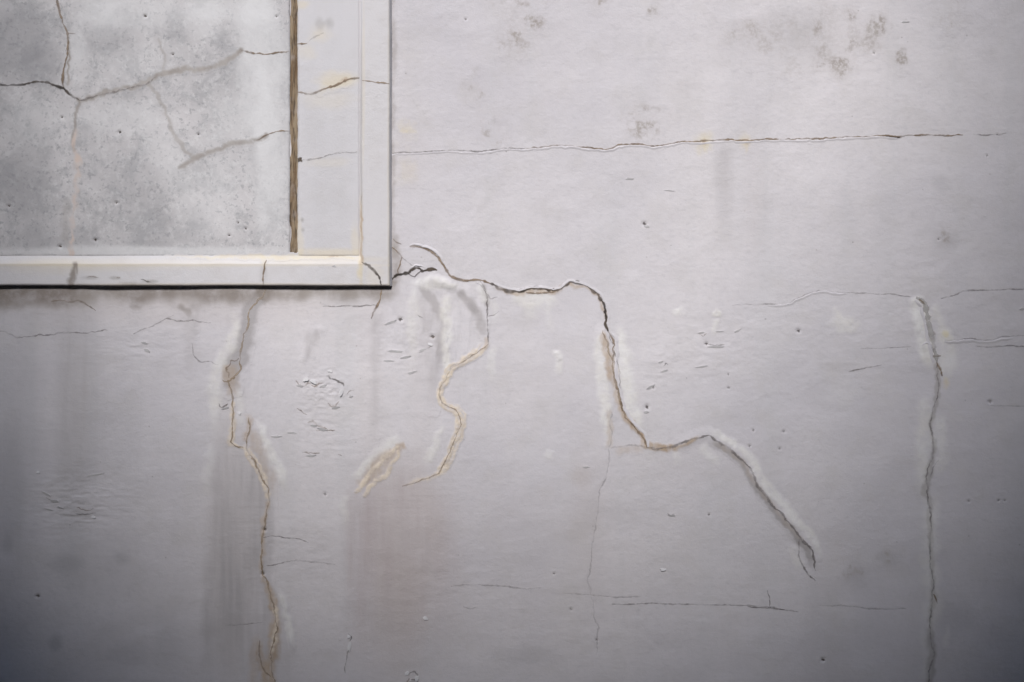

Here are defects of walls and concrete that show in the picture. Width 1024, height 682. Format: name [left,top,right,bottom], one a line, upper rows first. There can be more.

crack [1,0,307,171]
crack [392,134,990,156]
leakage [0,260,108,539]
leakage [176,286,297,682]
crack [223,261,298,681]
leakage [337,229,560,682]
crack [363,243,816,578]
crack [914,297,1023,376]